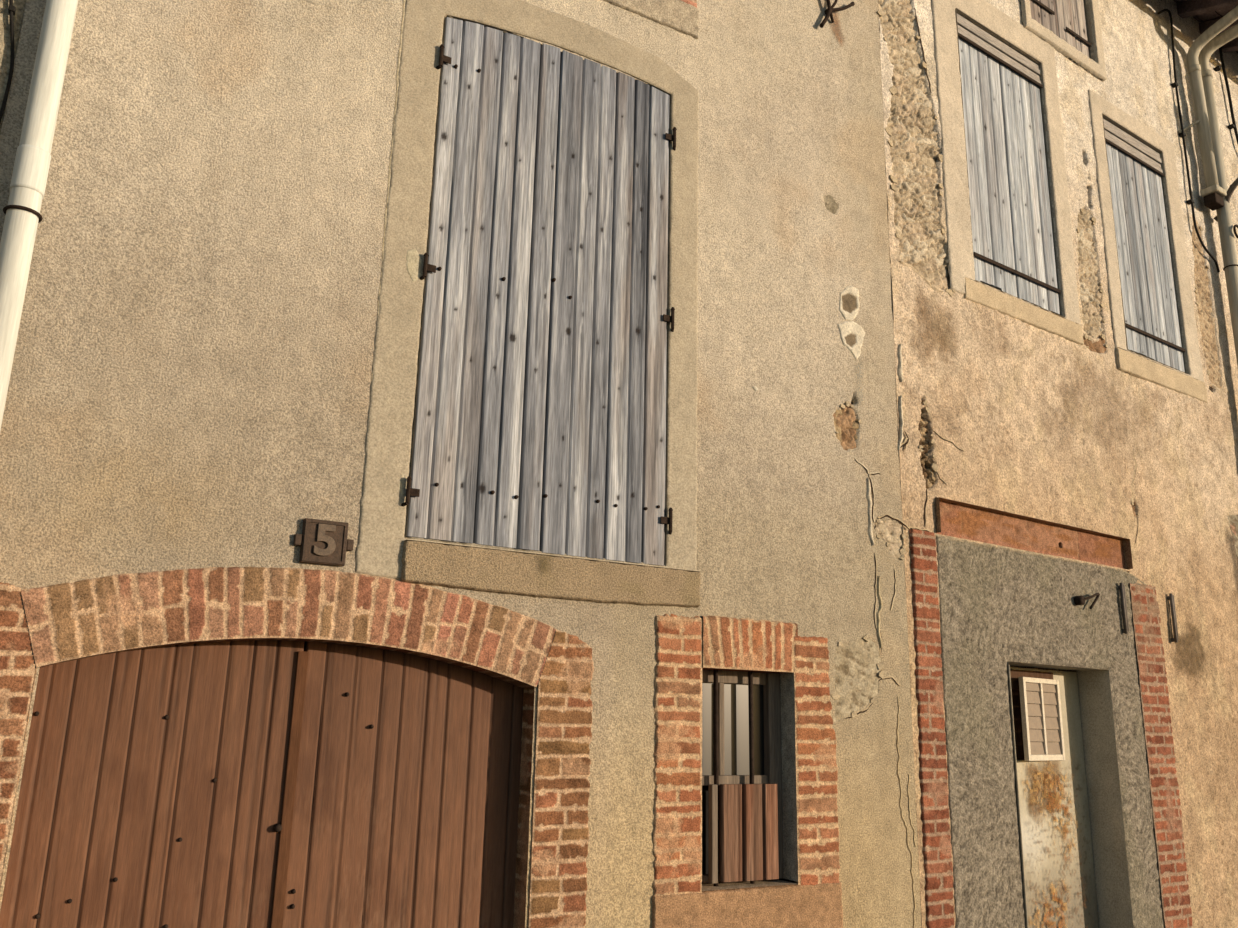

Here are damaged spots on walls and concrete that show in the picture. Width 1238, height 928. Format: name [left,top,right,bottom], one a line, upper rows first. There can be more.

spalling [877,0,956,297]
spalling [1076,207,1108,353]
spalling [1192,216,1221,388]
spalling [833,401,861,450]
spalling [898,344,938,488]
crack [855,430,964,633]
rust [1025,762,1075,853]
rust [1030,882,1067,928]